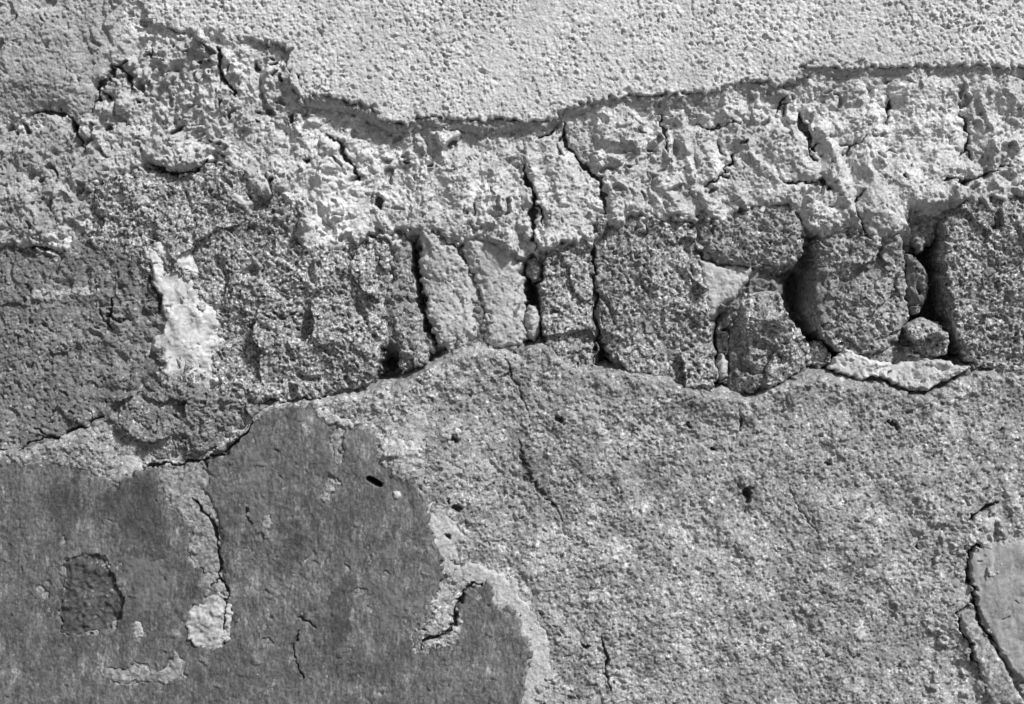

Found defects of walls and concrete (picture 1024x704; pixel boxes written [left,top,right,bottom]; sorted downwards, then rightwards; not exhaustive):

spalling [0,0,1024,325]
crack [522,167,543,242]
crack [538,123,608,211]
crack [707,155,735,185]
crack [776,97,831,190]
crack [944,121,1004,185]
spalling [387,357,399,372]
crack [148,431,249,468]
spalling [57,554,124,635]
crack [196,501,229,624]
crack [421,581,482,646]
peeling [959,607,1024,704]